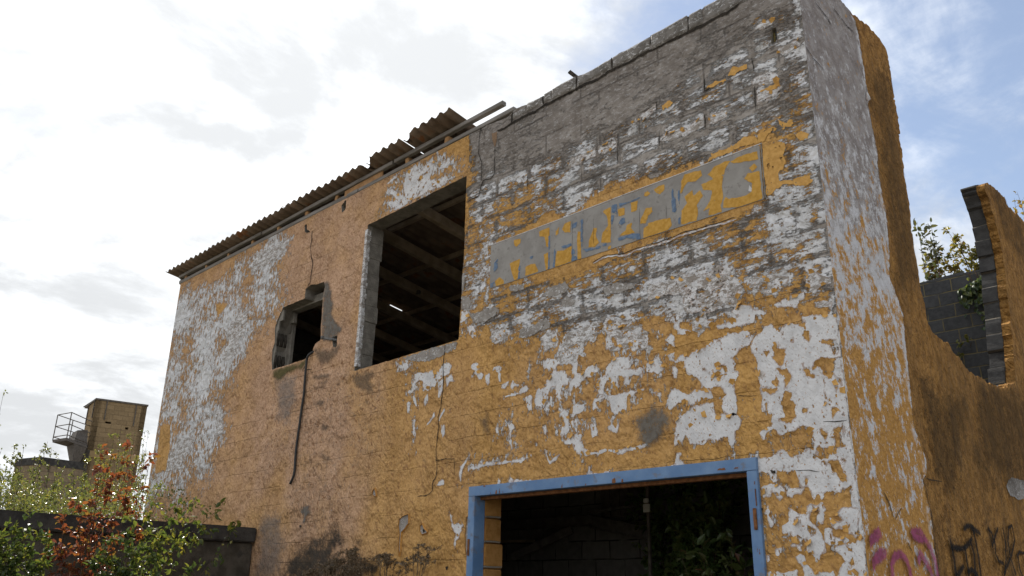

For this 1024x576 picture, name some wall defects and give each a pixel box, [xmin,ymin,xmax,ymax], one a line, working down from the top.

peeling [624,104,656,126]
peeling [660,110,727,141]
peeling [568,140,617,167]
peeling [387,159,450,210]
crack [592,217,736,264]
peeling [396,342,457,439]
crack [417,350,455,497]
water stain [636,404,669,447]
peeling [459,265,867,576]